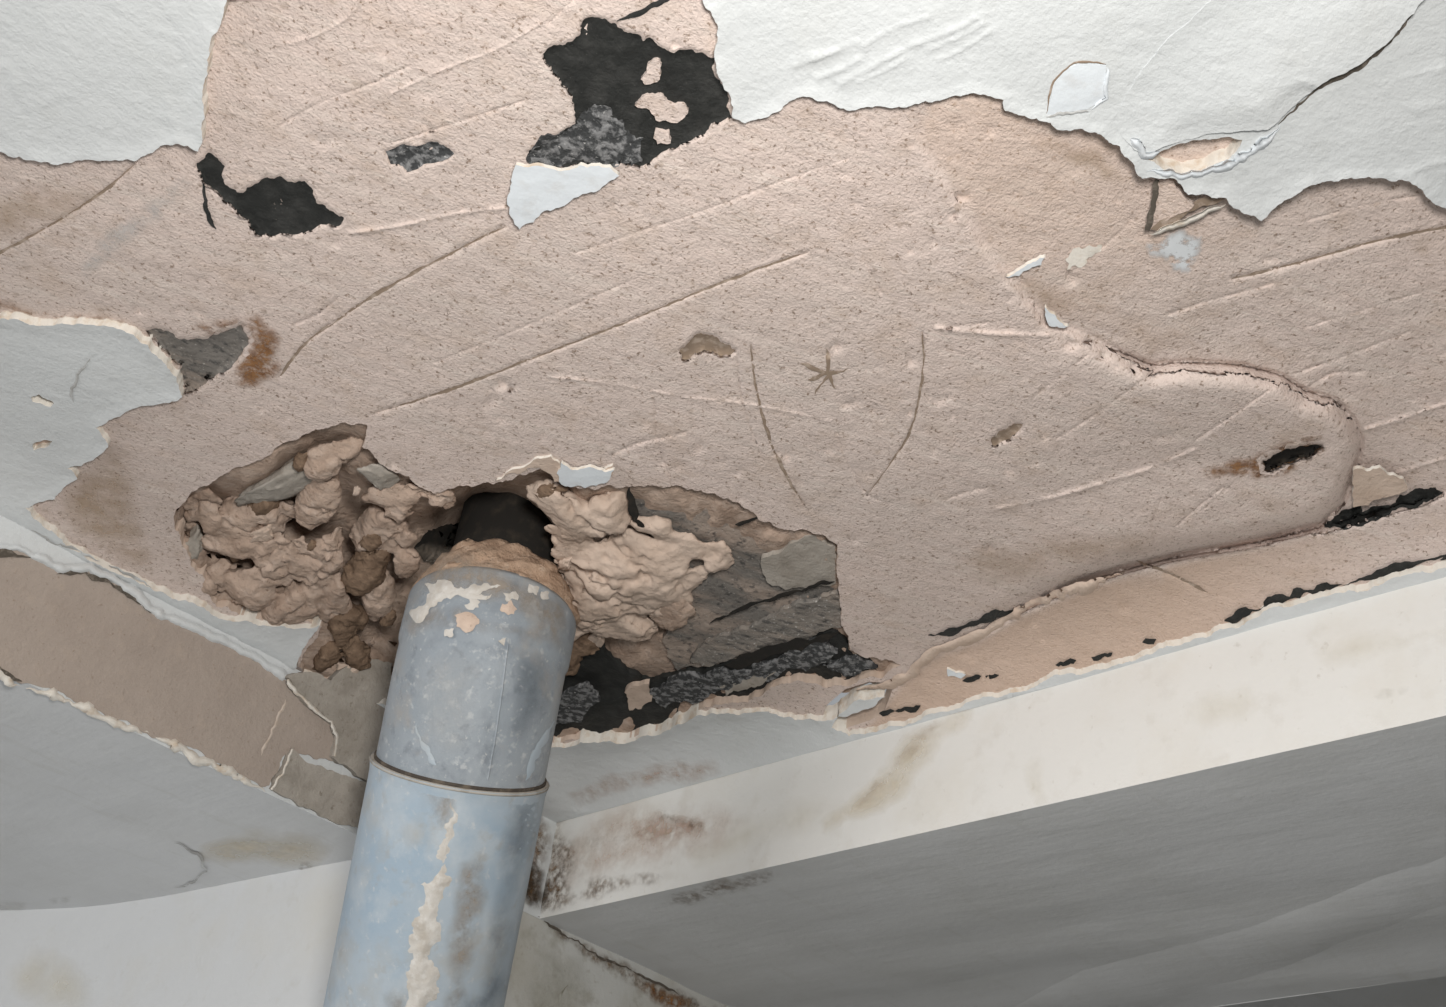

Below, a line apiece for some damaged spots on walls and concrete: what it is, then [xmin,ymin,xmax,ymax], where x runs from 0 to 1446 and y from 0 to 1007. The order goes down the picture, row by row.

flaking render [0,0,1446,792]
damp [526,867,546,904]